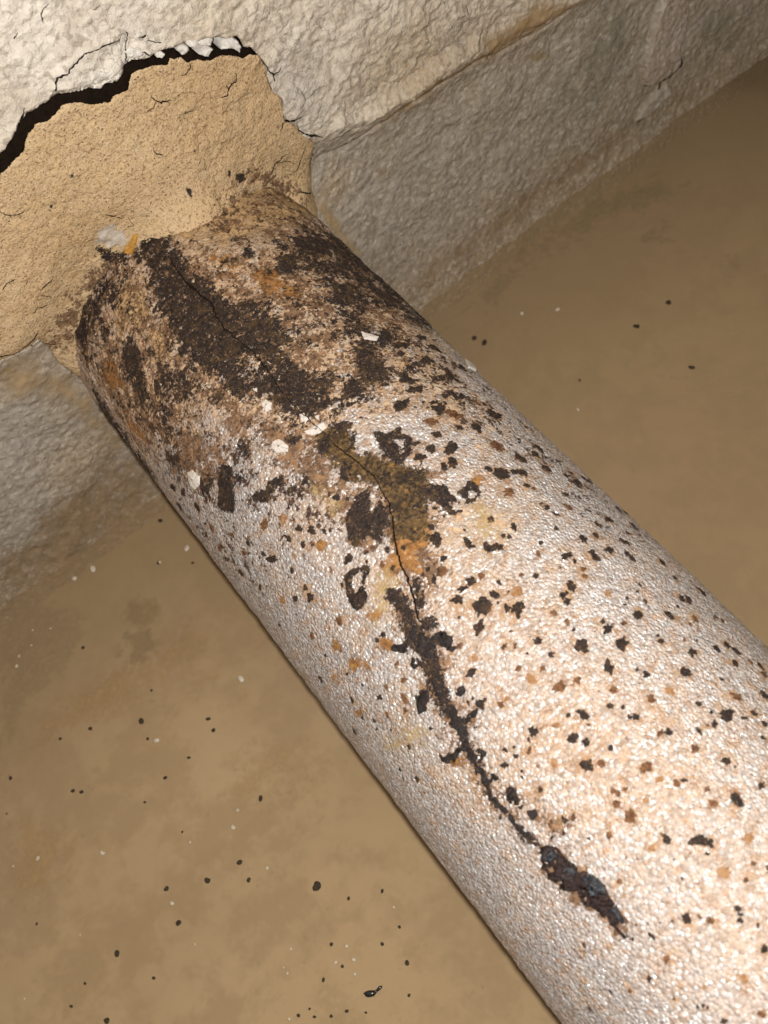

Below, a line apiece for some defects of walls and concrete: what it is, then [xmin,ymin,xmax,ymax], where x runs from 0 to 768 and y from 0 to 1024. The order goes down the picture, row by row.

spalling [0,37,318,376]
water stain [210,166,303,217]
rust [44,168,662,942]
crack [107,215,629,939]